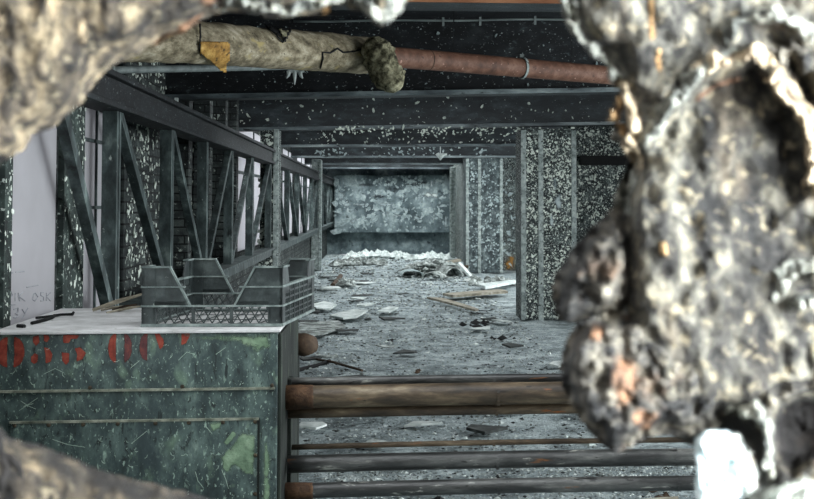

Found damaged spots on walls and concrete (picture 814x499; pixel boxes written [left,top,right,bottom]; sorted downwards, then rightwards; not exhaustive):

peeling [130,62,167,94]
peeling [64,204,84,297]
peeling [125,178,150,296]
peeling [130,124,160,240]
peeling [257,178,273,248]
peeling [296,101,625,319]